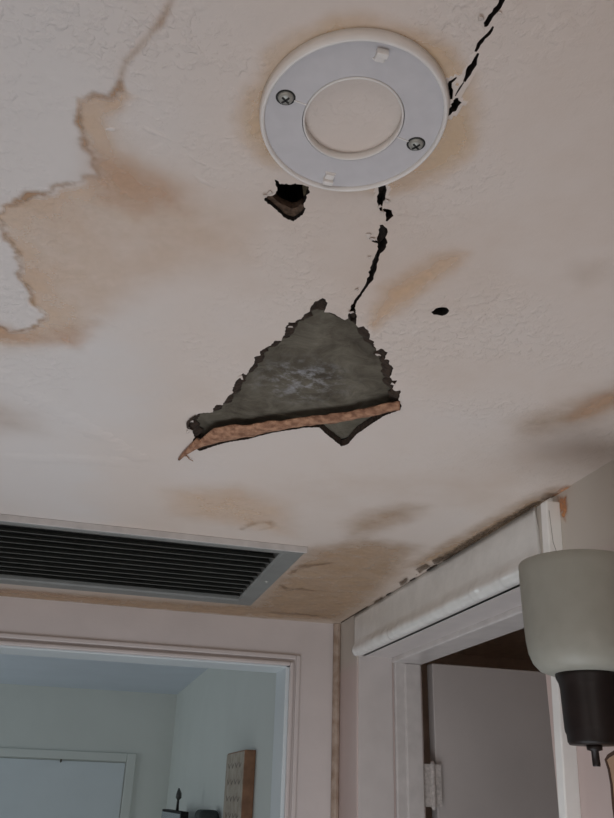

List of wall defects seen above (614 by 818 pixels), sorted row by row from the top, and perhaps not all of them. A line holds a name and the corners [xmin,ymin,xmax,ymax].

crack [448,0,505,116]
spalling [264,180,310,221]
crack [350,185,393,321]
spalling [178,298,401,461]